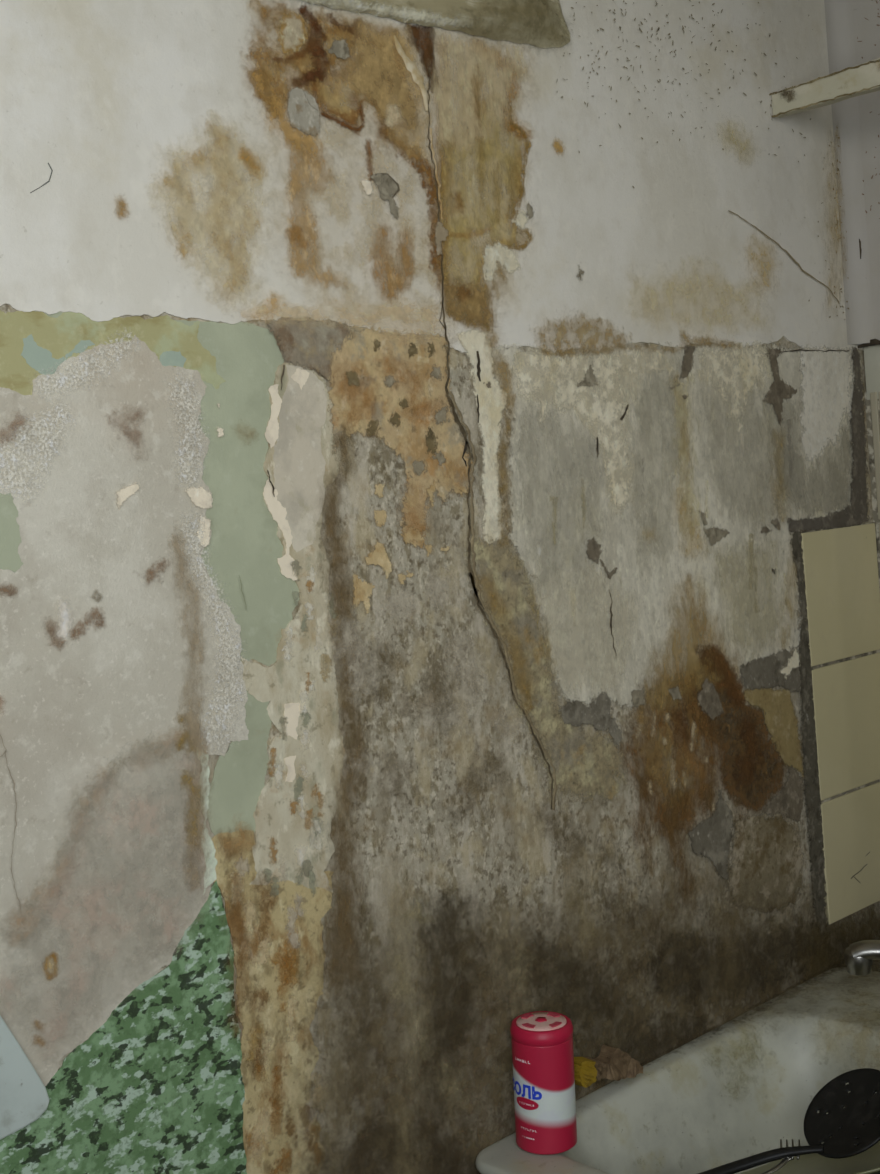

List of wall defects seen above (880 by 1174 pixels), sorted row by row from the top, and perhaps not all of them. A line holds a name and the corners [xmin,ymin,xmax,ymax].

peeling [306,0,473,26]
water stain [556,0,773,129]
water stain [164,125,264,293]
water stain [250,2,532,346]
crack [427,69,443,222]
crack [728,210,840,304]
water stain [495,361,514,405]
water stain [540,317,626,355]
crack [767,338,880,354]
crack [439,251,558,810]
peeling [0,310,870,1174]
water stain [318,478,880,1174]